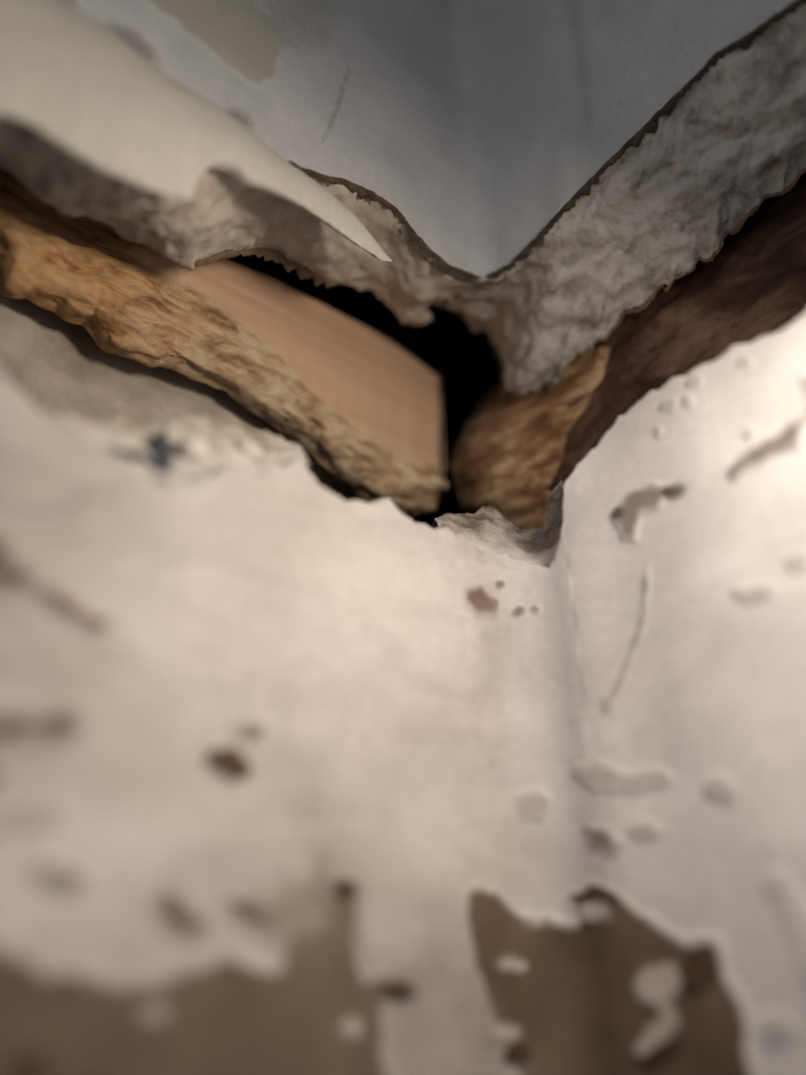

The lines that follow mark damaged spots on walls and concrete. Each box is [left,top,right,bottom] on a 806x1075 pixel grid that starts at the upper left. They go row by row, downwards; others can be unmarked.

flaking render [0,0,806,399]
flaking render [54,409,309,485]
flaking render [431,480,564,567]
peeling [0,869,416,1075]
peeling [460,877,763,1075]